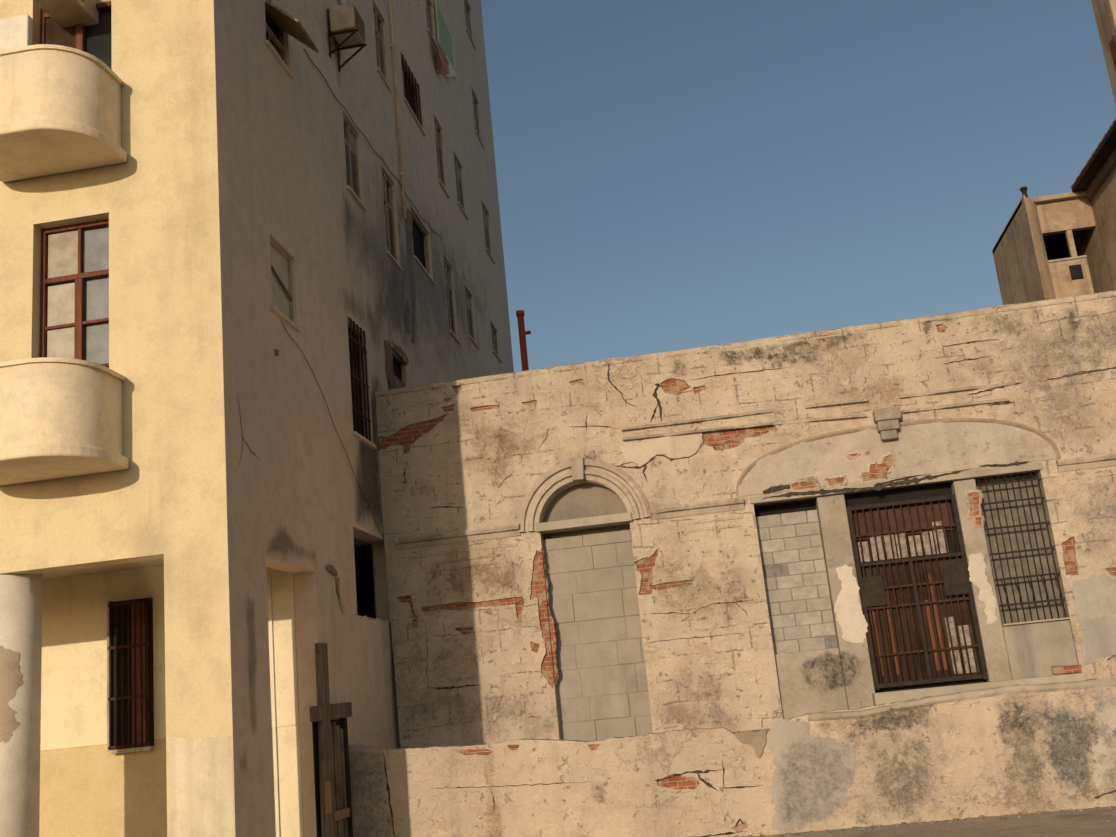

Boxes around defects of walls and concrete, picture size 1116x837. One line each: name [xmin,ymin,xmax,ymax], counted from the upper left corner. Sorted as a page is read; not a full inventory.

crack [607,364,662,423]
crack [968,366,1116,405]
spalling [378,386,462,454]
crack [576,417,703,481]
peeling [620,426,778,466]
spalling [788,450,897,492]
spalling [965,490,985,528]
spalling [634,550,693,595]
spalling [1061,537,1078,575]
spalling [398,550,559,688]
crack [655,764,762,791]